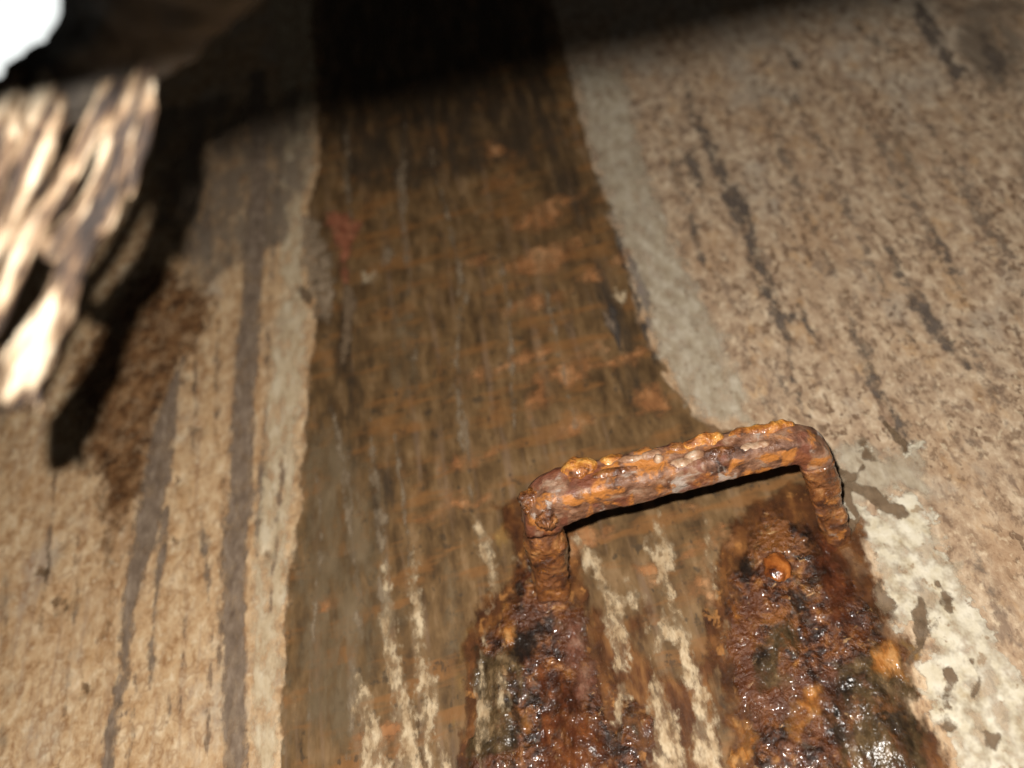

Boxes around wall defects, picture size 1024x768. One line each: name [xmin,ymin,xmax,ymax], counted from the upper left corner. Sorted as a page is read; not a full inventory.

damp [669,81,815,351]
damp [102,356,197,768]
damp [201,533,210,584]
damp [208,0,754,768]
corrosion [457,498,530,768]
damp [537,465,805,768]
corrosion [561,419,795,479]
corrosion [563,483,822,768]
corrosion [820,516,948,768]